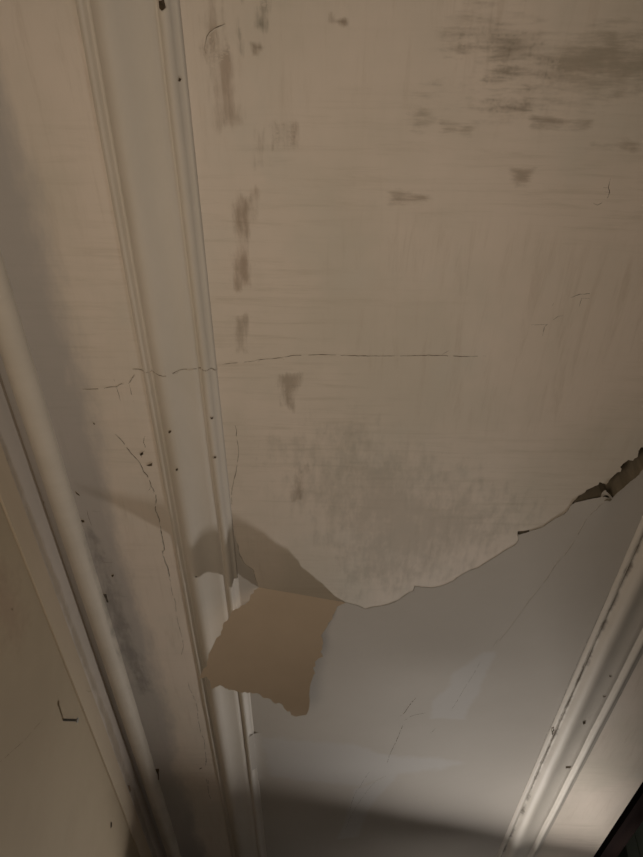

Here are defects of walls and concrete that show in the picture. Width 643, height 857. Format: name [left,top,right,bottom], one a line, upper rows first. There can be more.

crack [83,354,356,395]
peeling [199,587,345,717]